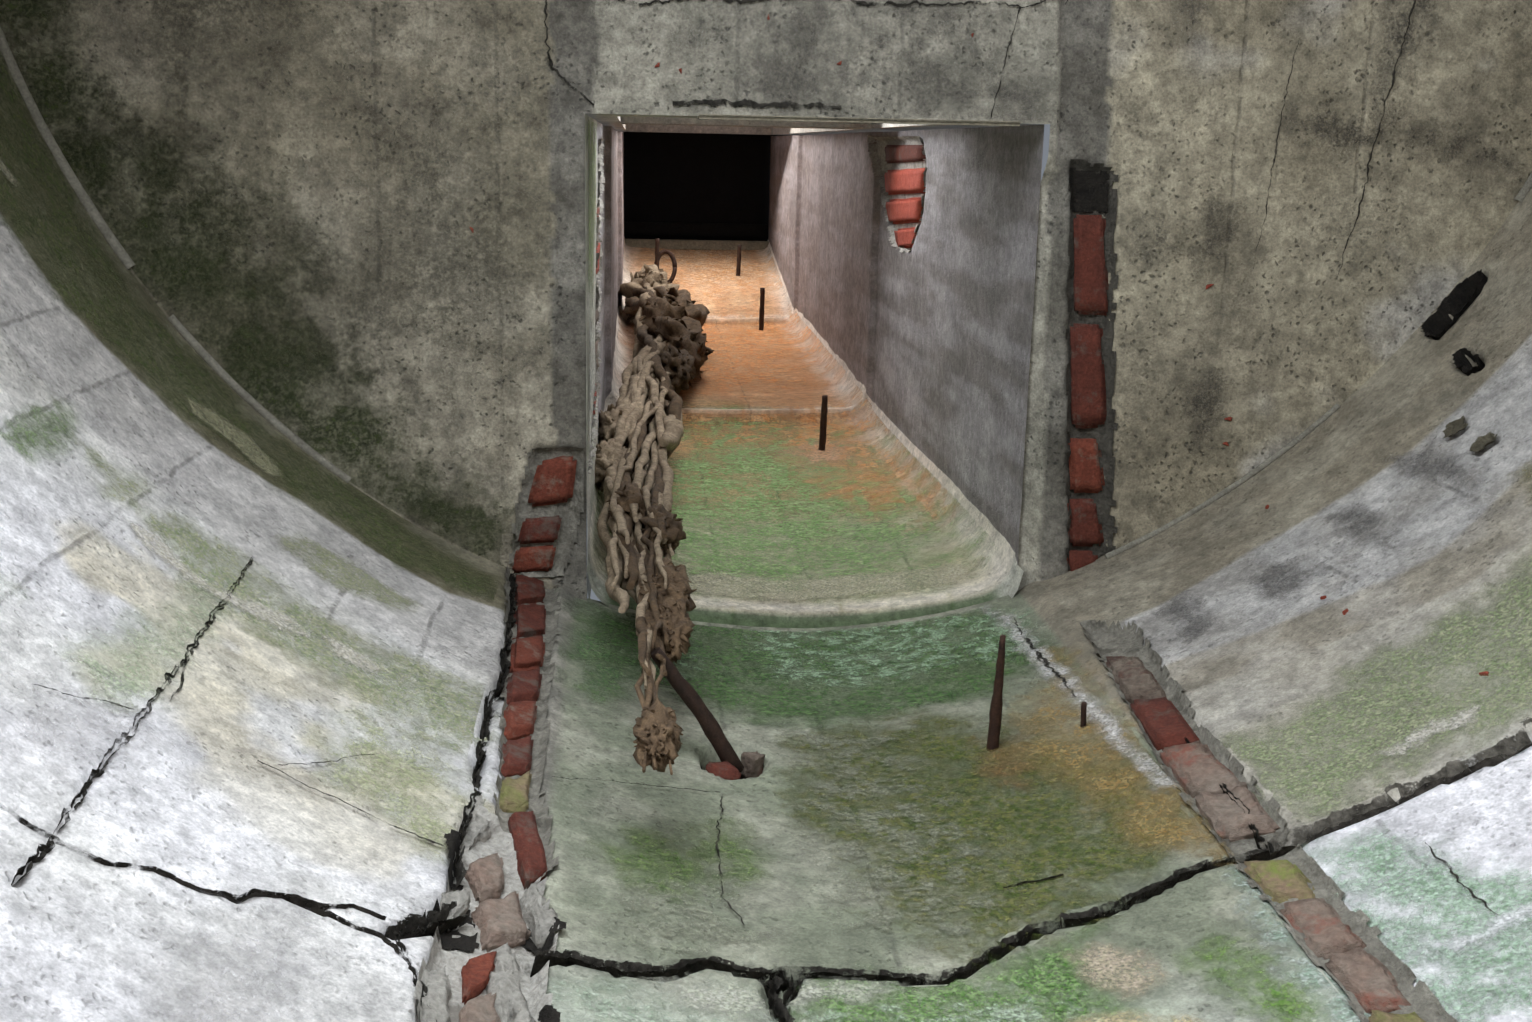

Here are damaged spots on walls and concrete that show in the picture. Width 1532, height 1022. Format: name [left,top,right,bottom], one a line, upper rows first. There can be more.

crack [618,0,769,8]
crack [544,0,595,106]
crack [838,0,1068,118]
damp [376,153,515,323]
hole [1421,269,1488,340]
hole [1452,348,1485,376]
spalling [1443,416,1498,452]
crack [1014,618,1076,697]
crack [17,572,518,1022]
crack [530,776,1274,1022]
crack [1425,842,1498,915]